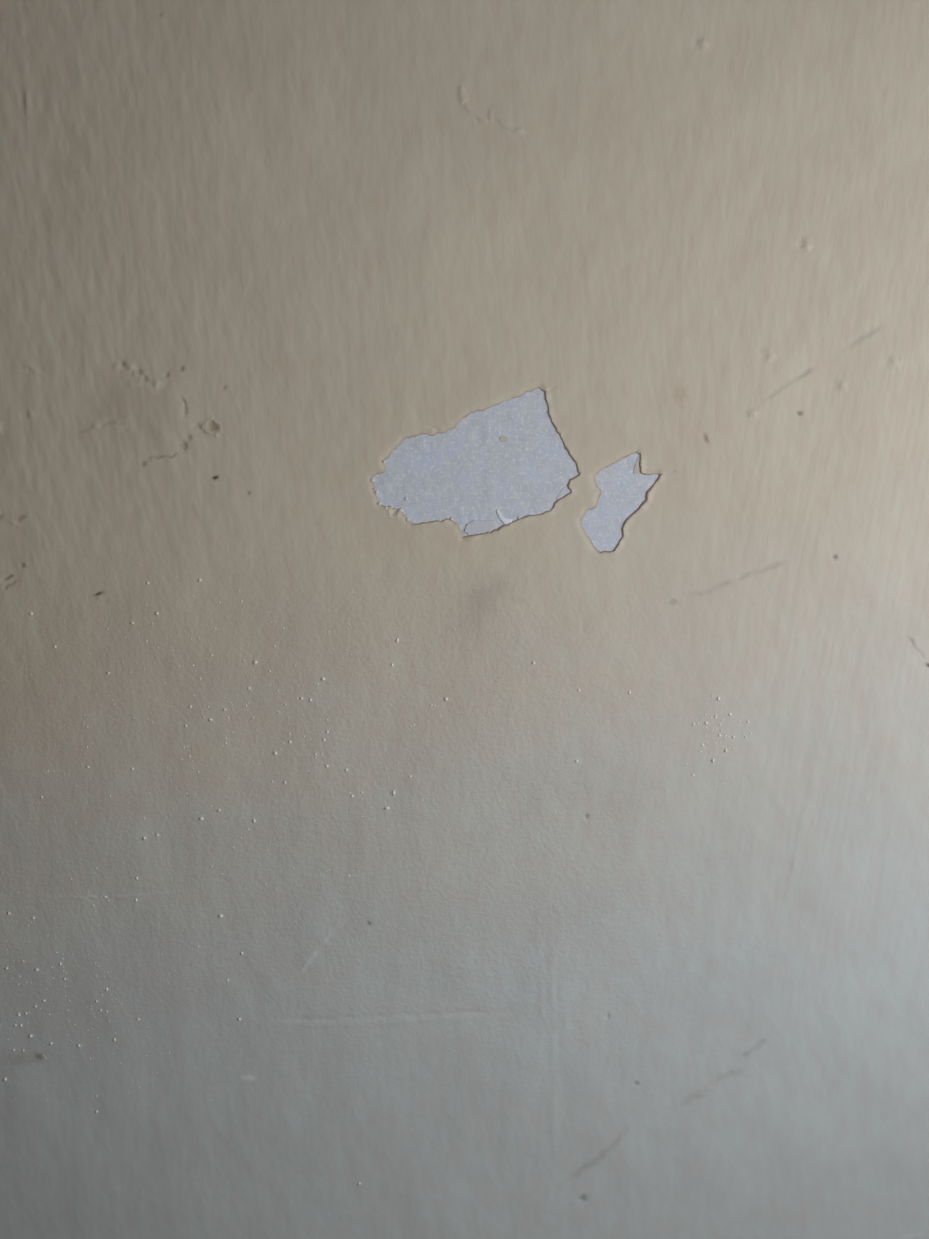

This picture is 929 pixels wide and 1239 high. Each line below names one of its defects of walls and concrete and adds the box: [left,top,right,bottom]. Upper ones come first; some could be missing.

peeling [362,376,679,562]